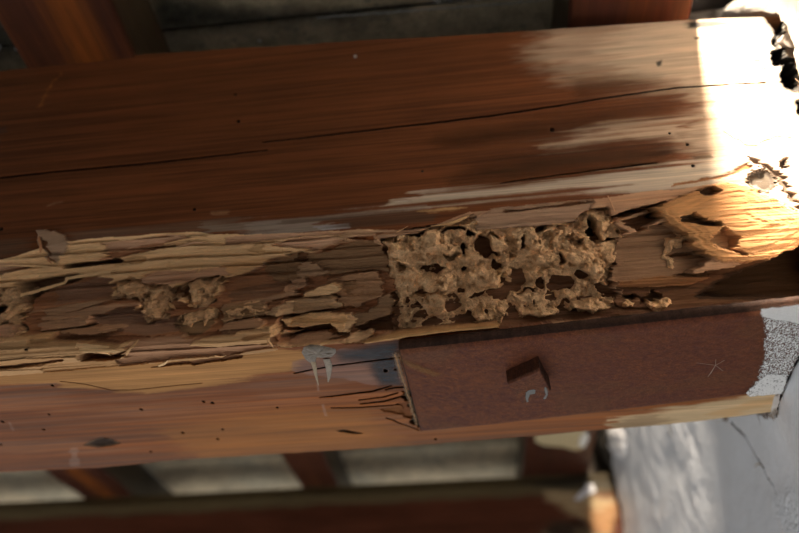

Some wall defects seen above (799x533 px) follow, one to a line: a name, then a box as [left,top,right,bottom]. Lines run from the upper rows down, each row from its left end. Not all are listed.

crack [1,82,765,178]
spalling [0,173,799,376]
crack [324,385,418,430]
rust [394,354,417,425]